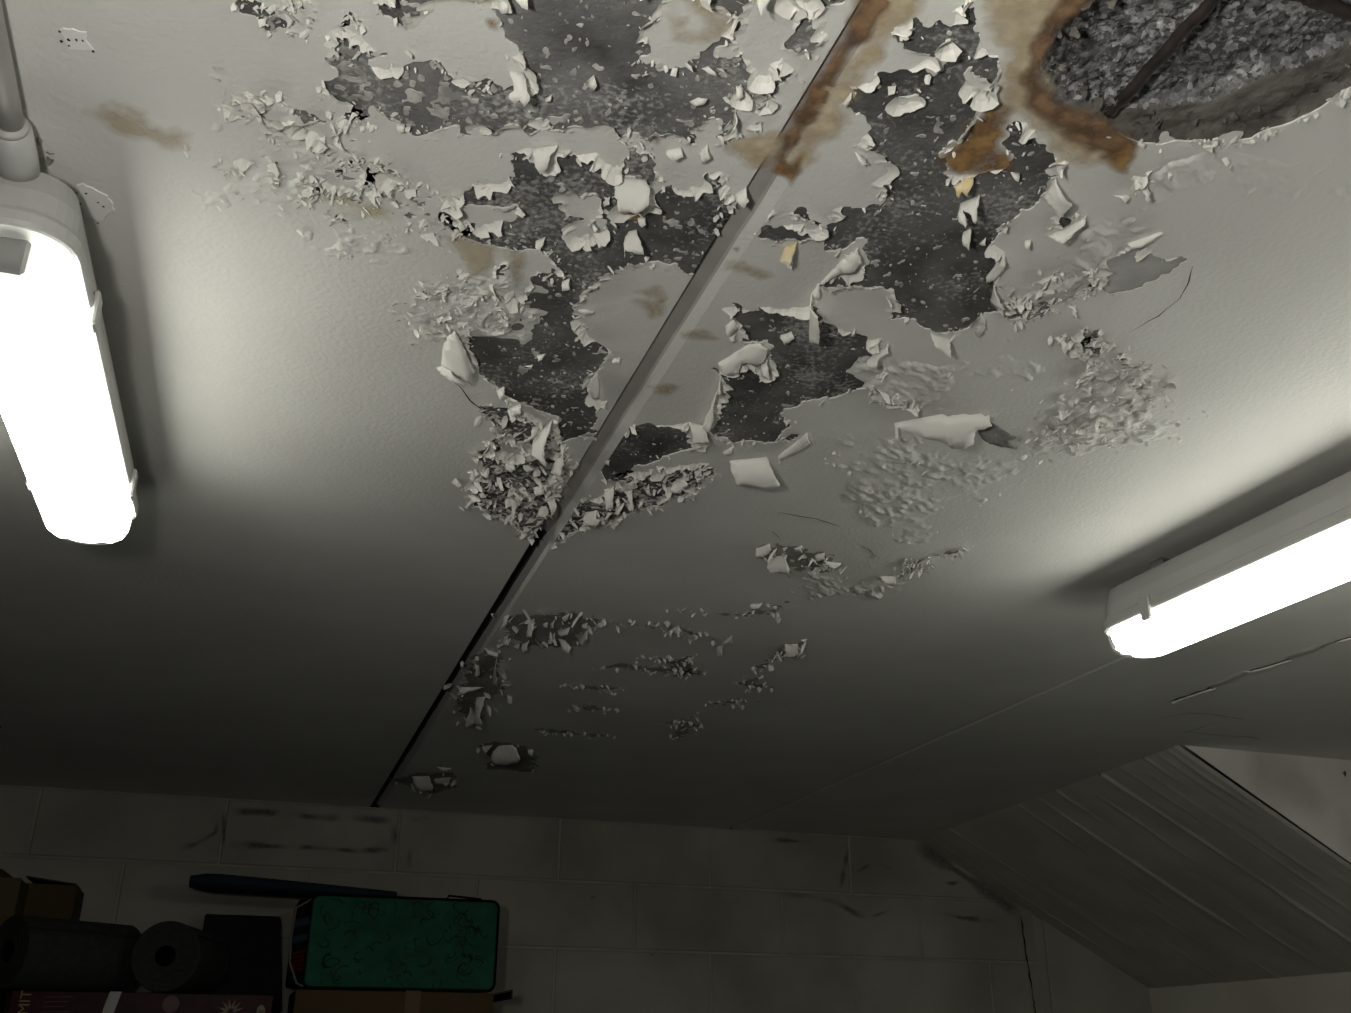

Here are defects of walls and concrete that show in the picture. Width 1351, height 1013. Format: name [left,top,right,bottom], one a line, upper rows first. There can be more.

corrosion [732,0,915,180]
spalling [1038,0,1351,204]
peeling [212,0,1189,549]
peeling [443,601,807,775]
crack [1170,633,1351,704]
crack [1020,916,1036,1013]